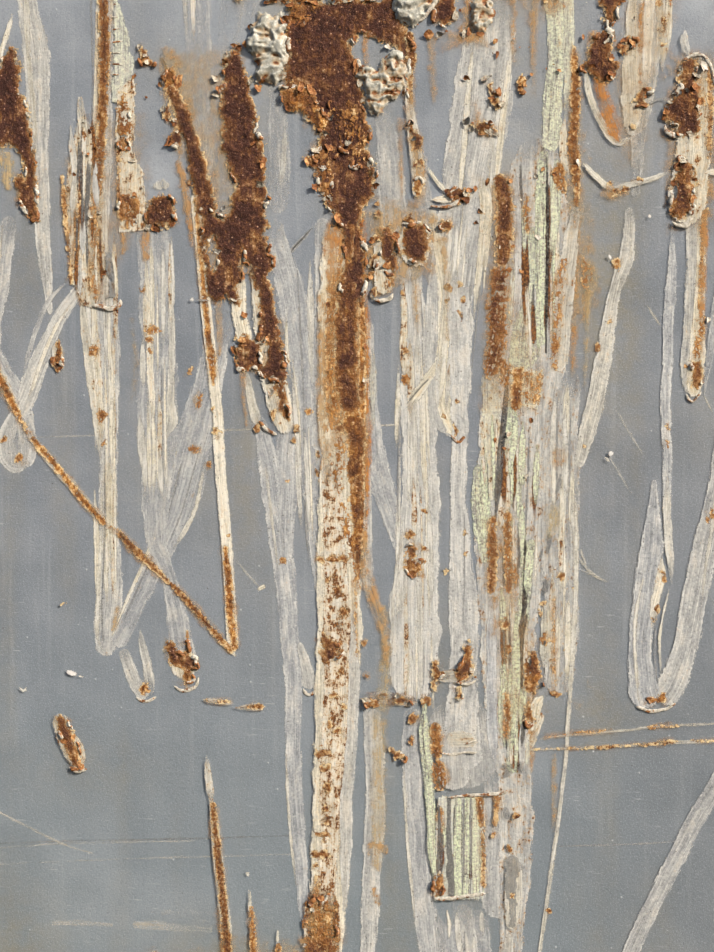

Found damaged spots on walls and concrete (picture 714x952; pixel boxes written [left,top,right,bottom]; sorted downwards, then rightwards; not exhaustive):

corrosion [462,75,506,137]
peeling [428,169,478,209]
corrosion [474,0,714,411]
peeling [91,252,122,312]
corrosion [0,0,466,661]
corrosion [486,511,517,607]
corrosion [502,598,562,740]
corrosion [53,714,87,773]
corrosion [530,724,714,765]
corrosion [205,762,232,952]
peeling [426,782,508,901]
spalling [505,855,523,928]